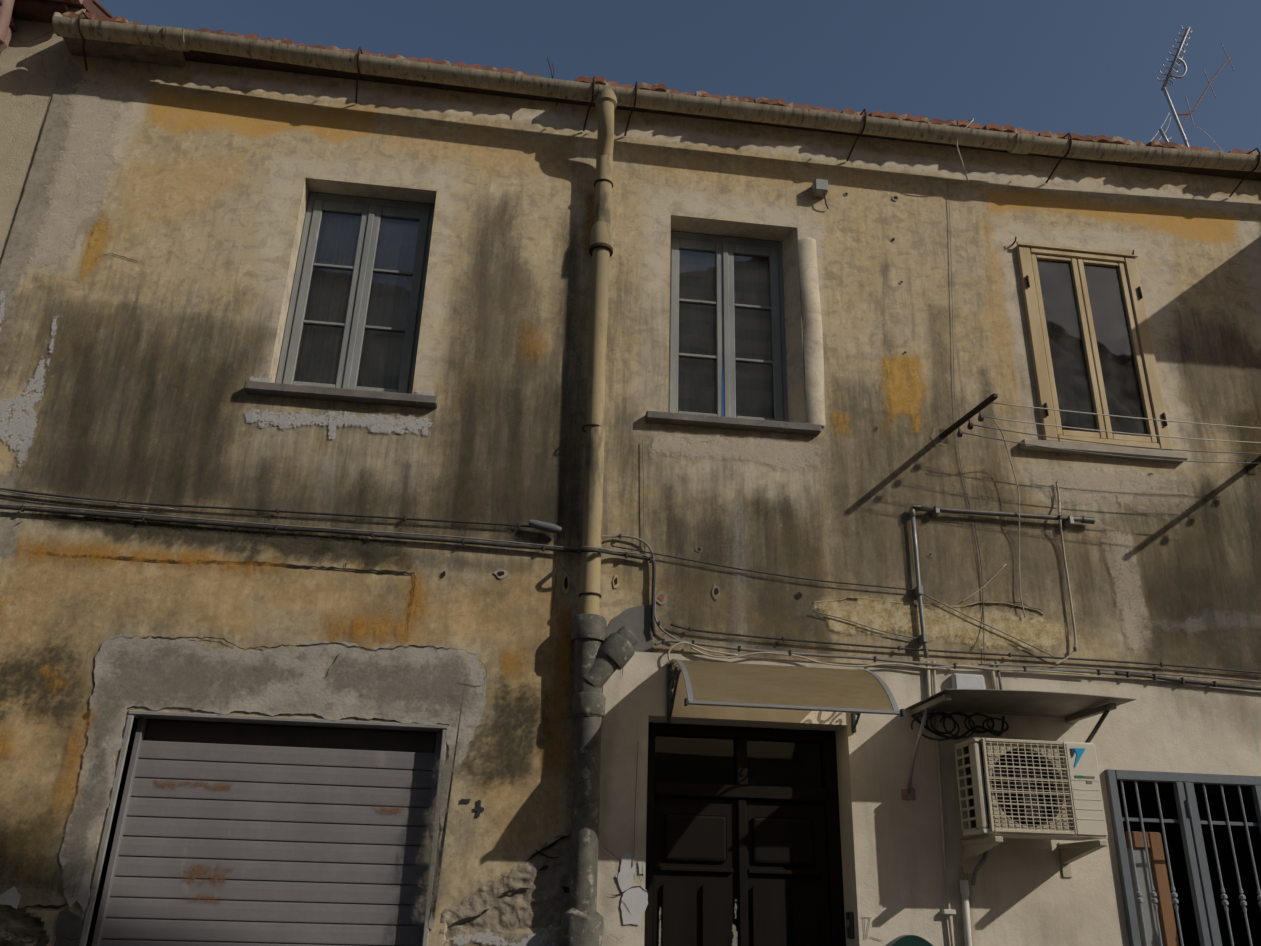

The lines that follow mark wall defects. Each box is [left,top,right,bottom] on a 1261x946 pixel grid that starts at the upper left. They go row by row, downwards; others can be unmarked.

peeling [0,316,59,467]
peeling [244,408,433,439]
damp [0,643,294,893]
damp [415,683,547,921]
spalling [0,887,68,946]
spalling [440,831,572,946]
peeling [616,852,661,946]